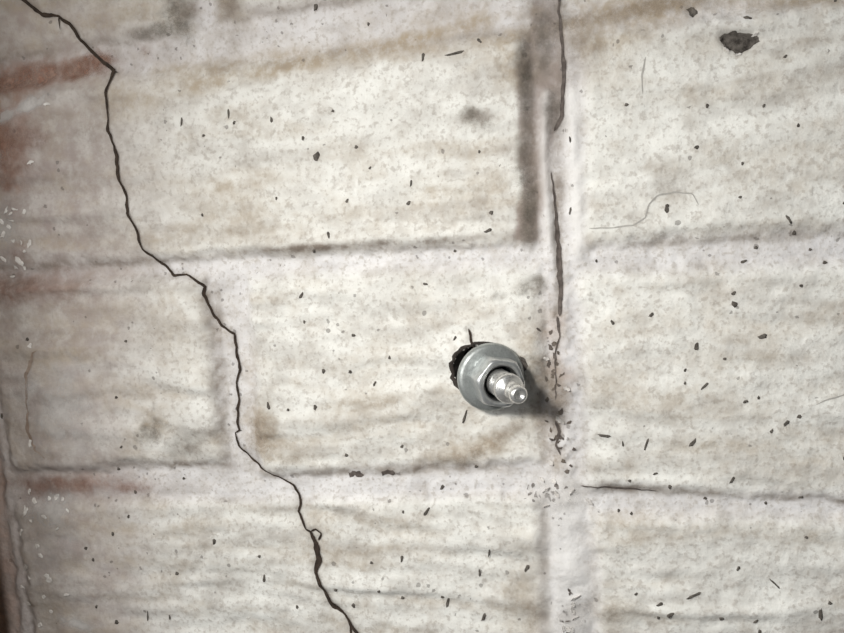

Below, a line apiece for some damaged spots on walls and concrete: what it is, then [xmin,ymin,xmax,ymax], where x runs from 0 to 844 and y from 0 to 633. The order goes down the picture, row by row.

crack [554,0,566,131]
crack [21,0,358,633]
crack [551,173,563,400]
crack [554,421,562,455]